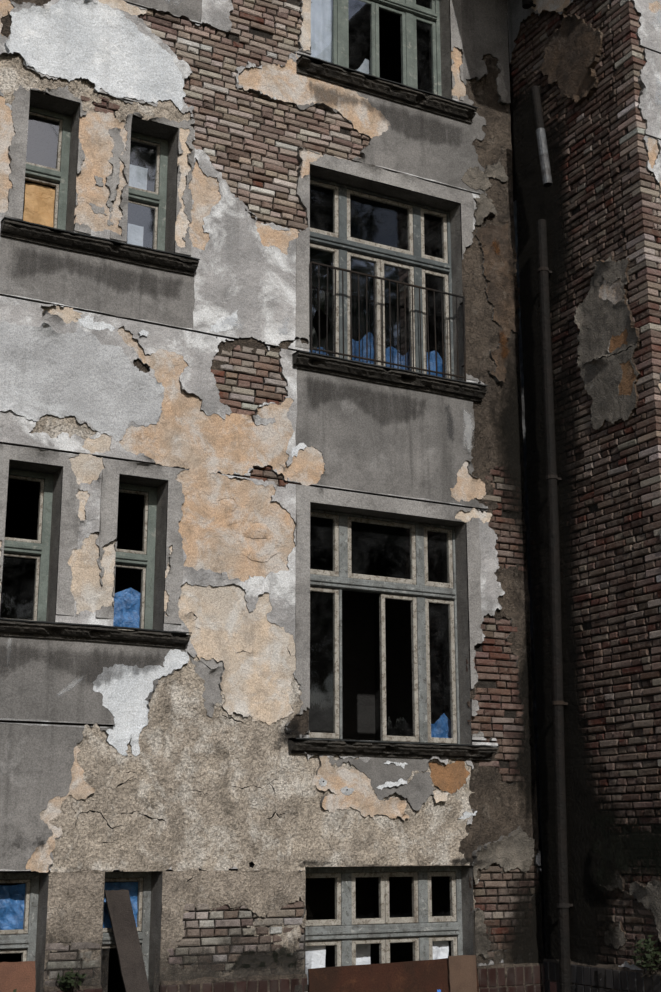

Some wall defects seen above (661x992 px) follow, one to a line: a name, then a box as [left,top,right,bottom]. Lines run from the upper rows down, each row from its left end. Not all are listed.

flaking render [0,0,391,255]
flaking render [0,46,541,984]
flaking render [510,0,661,846]
crack [190,779,285,819]
flaking render [599,861,661,971]